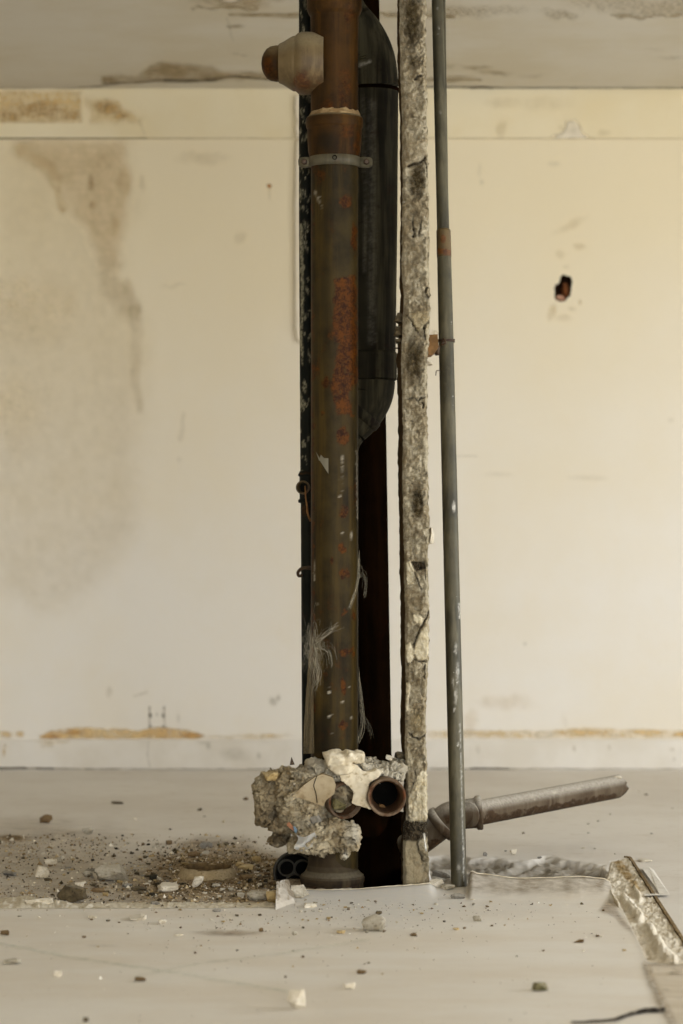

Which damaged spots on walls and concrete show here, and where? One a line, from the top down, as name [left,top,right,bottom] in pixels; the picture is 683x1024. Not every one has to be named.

peeling [115,65,268,84]
spalling [554,275,572,302]